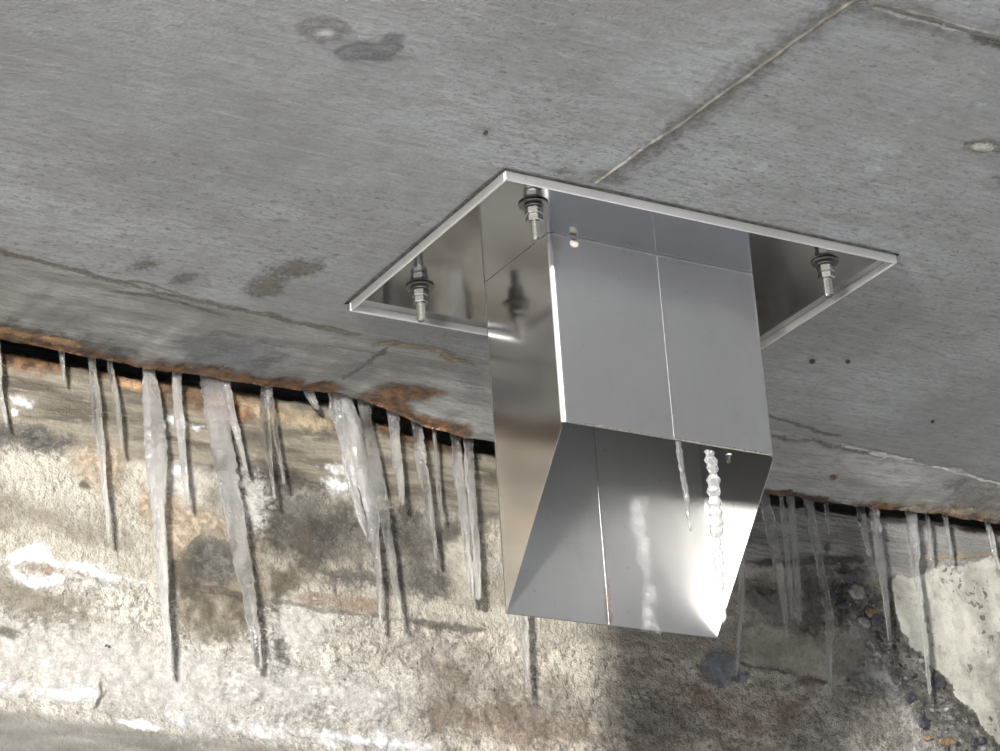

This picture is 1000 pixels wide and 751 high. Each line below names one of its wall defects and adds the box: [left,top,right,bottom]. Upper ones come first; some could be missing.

spalling [968,139,1000,153]
corrosion [0,326,342,422]
corrosion [274,401,335,432]
corrosion [358,383,476,459]
corrosion [763,489,1000,534]
water stain [0,464,462,751]
spalling [745,562,1000,751]